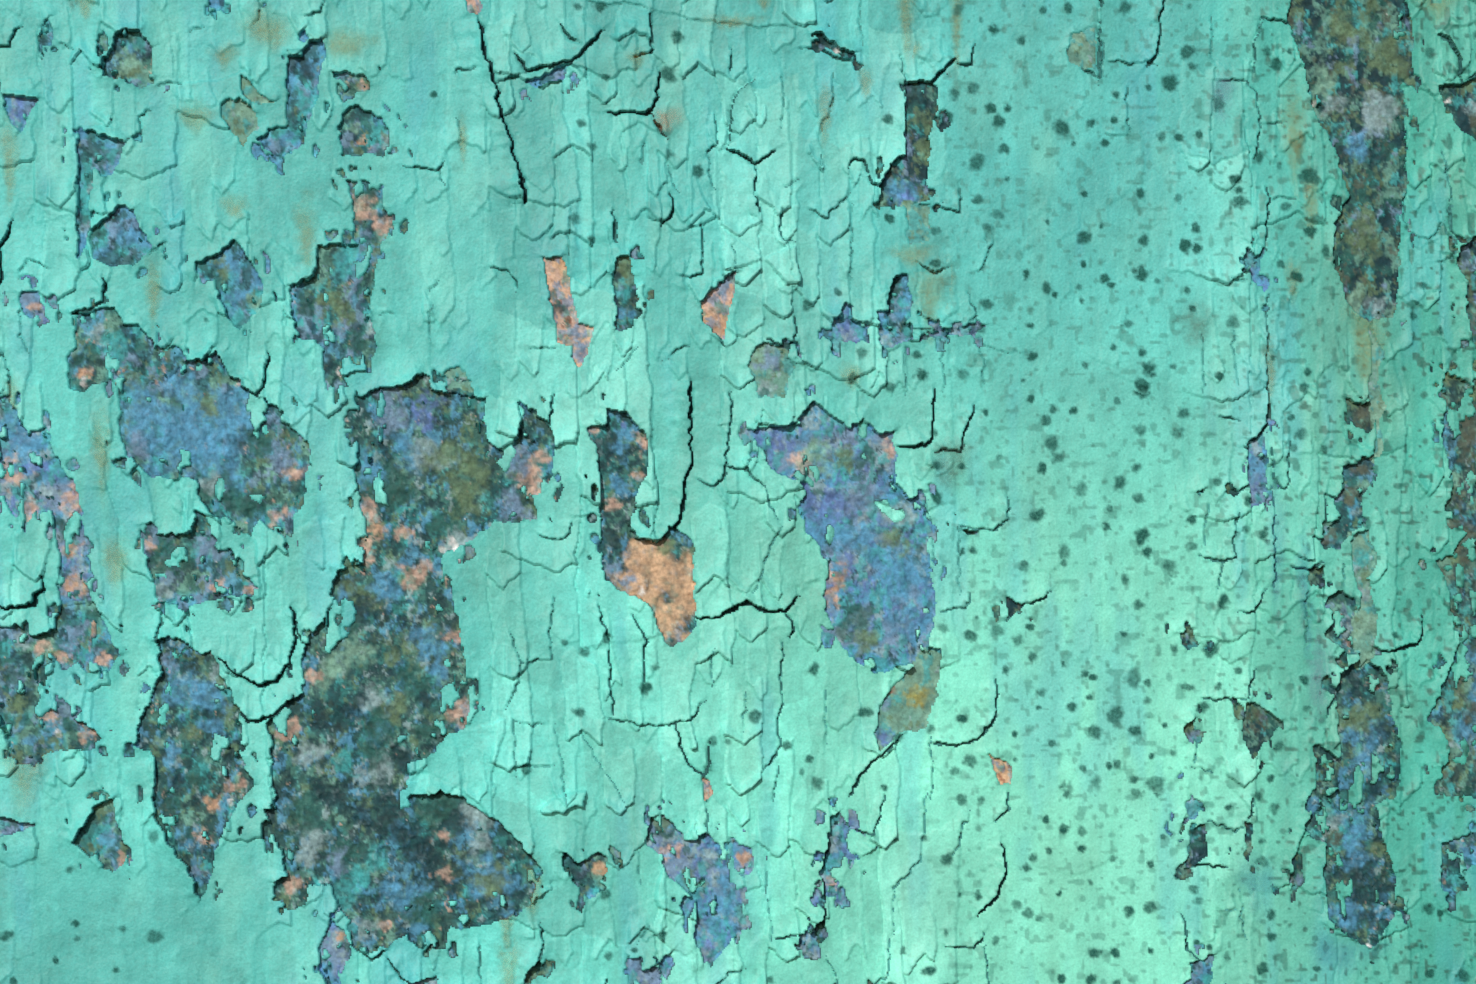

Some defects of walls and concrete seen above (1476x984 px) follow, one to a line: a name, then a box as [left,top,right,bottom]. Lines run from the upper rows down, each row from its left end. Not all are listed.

crack [402,0,906,283]
peeling [536,246,654,367]
crack [896,188,1033,453]
crack [1199,0,1350,643]
crack [218,605,332,724]
peeling [0,21,623,984]
peeling [580,394,697,647]
crack [505,317,801,834]
peeling [739,275,989,751]
peeling [1270,0,1476,964]
peeling [638,778,767,971]
crack [765,678,1011,984]